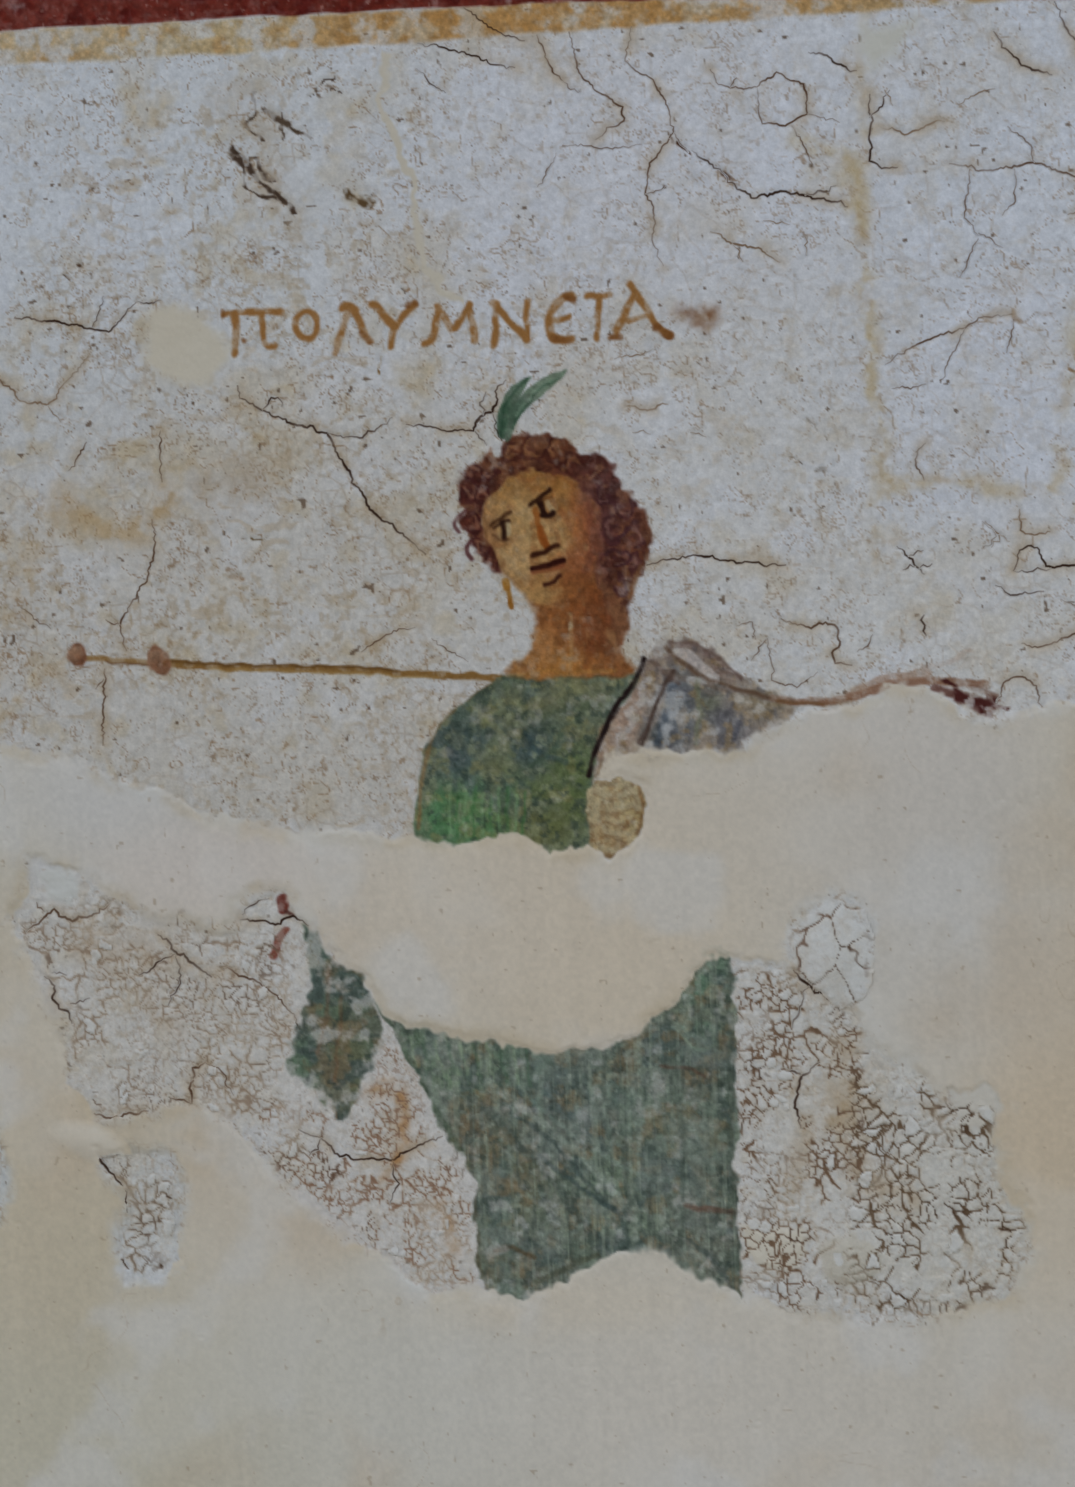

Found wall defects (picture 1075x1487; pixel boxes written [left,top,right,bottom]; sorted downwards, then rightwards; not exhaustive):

crack [1054,1,1075,41]
crack [416,7,1052,266]
crack [949,126,1075,278]
crack [0,296,161,472]
crack [156,431,164,482]
crack [236,379,507,555]
crack [626,402,668,435]
crack [885,313,1015,390]
crack [95,519,157,746]
spalling [937,677,1012,721]
crack [13,893,478,1293]
crack [729,901,1030,1321]